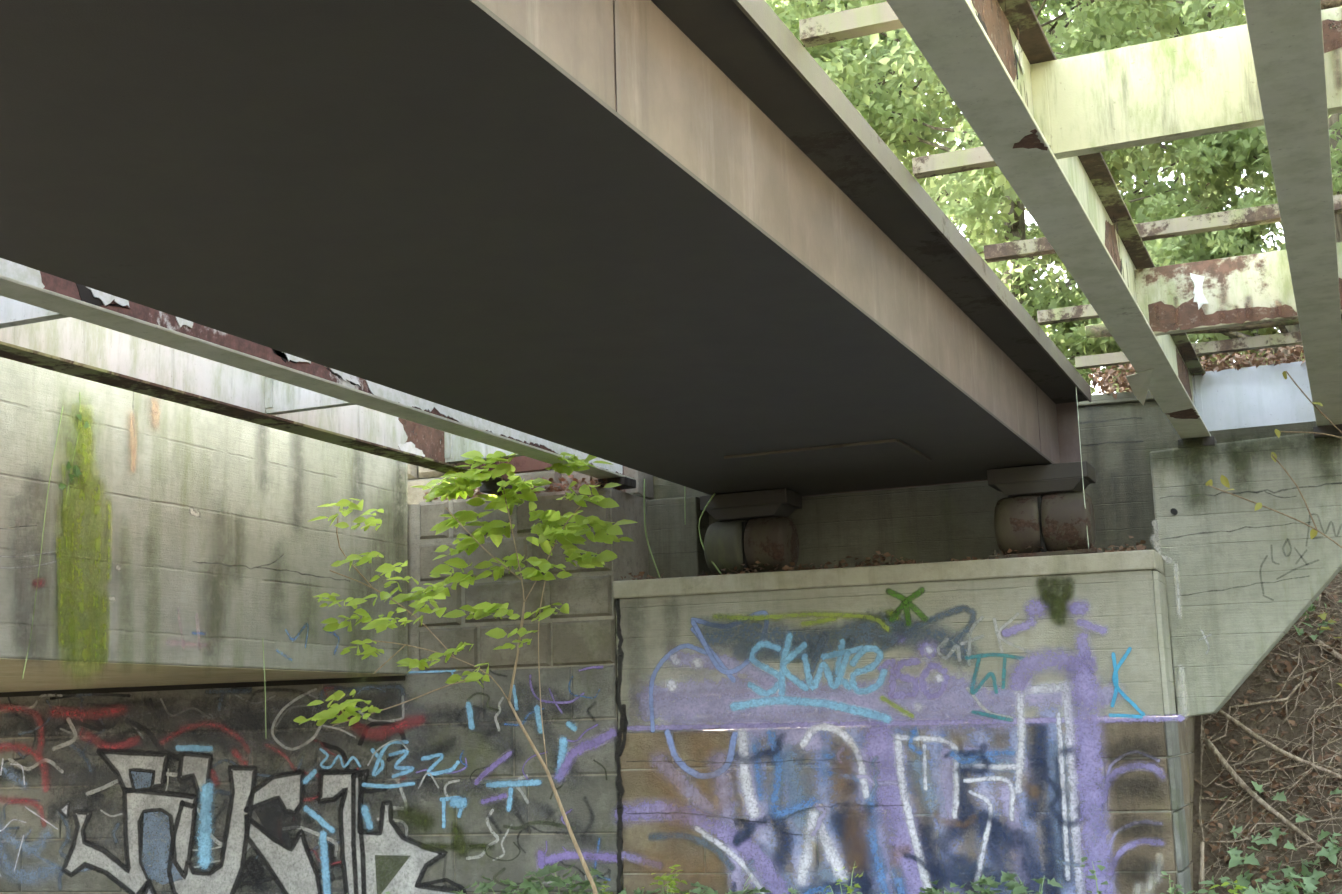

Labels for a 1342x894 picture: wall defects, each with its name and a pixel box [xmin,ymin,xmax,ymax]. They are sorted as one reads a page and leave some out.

corrosion [1322,9,1342,87]
corrosion [1148,273,1297,333]
damp [57,403,111,674]
damp [1037,578,1074,624]
crack [615,598,904,894]